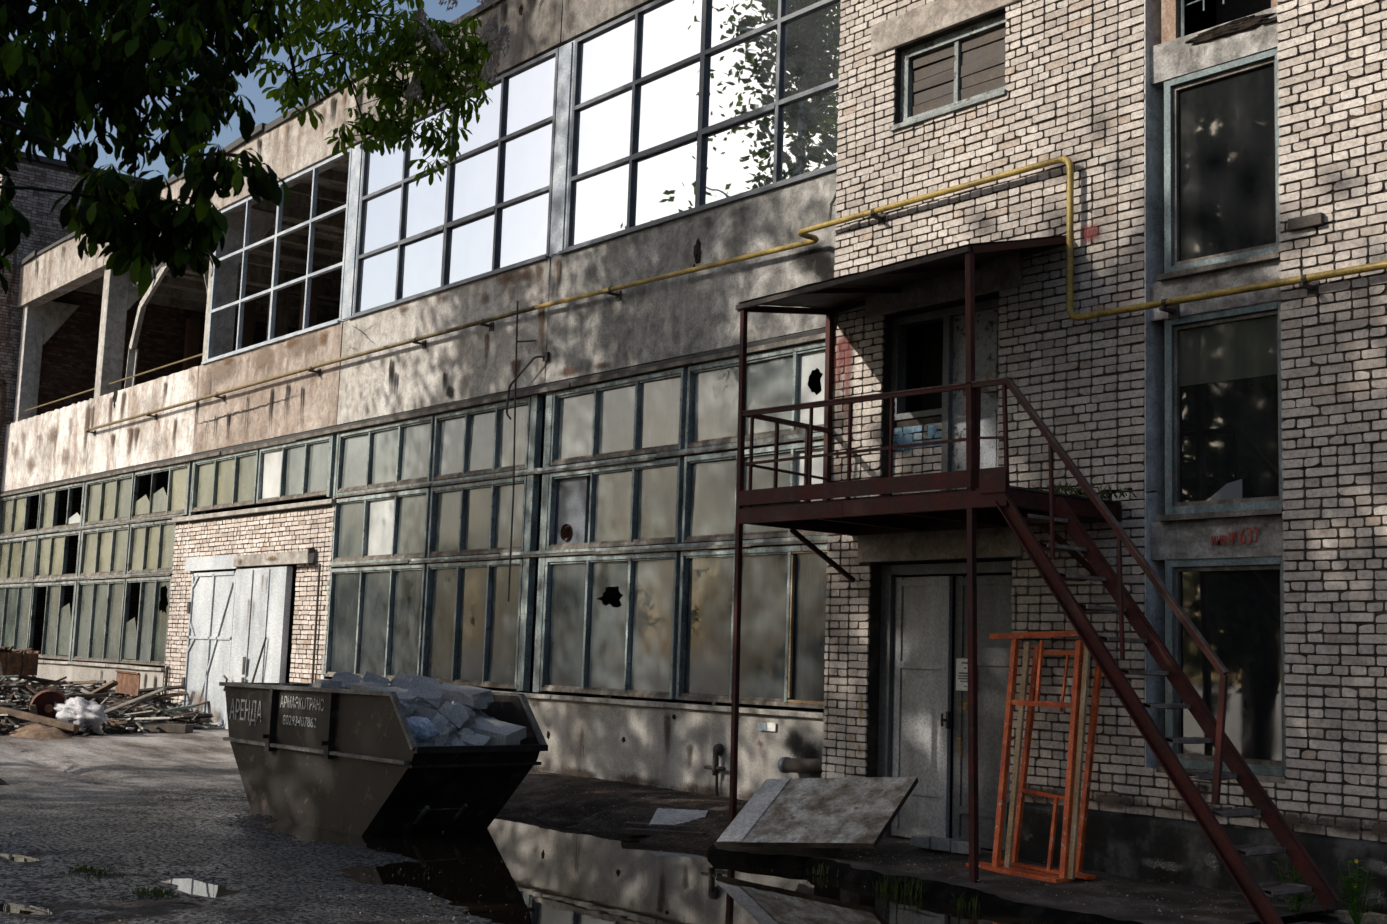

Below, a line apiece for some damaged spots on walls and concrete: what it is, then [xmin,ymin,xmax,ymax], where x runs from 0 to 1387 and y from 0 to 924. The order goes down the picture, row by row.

leakage [389,359,397,397]
leakage [269,384,303,425]
leakage [12,392,139,469]
spalling [1317,910,1387,924]